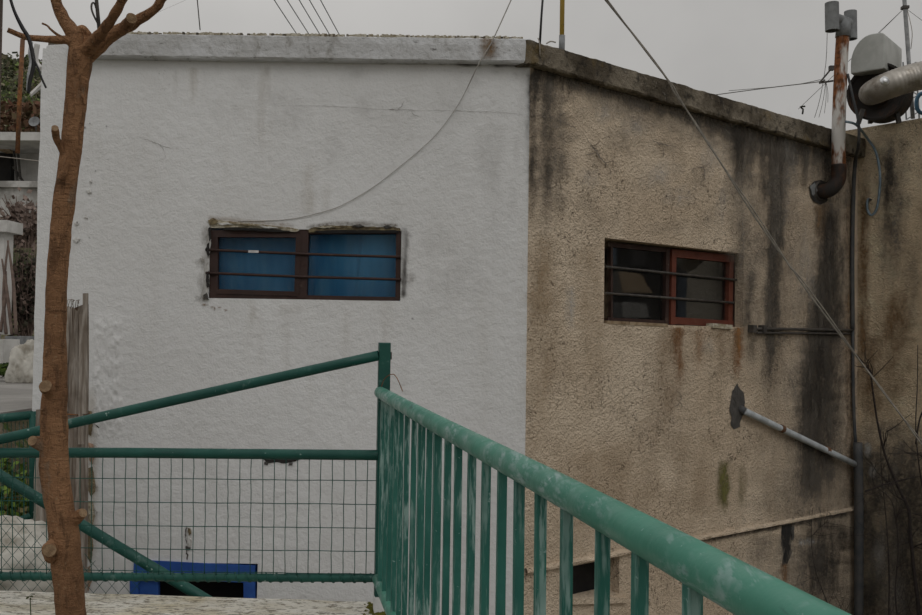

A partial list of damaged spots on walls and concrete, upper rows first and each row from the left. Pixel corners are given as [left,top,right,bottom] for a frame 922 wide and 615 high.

water stain [528,69,831,373]
water stain [719,463,730,504]
water stain [798,197,847,491]